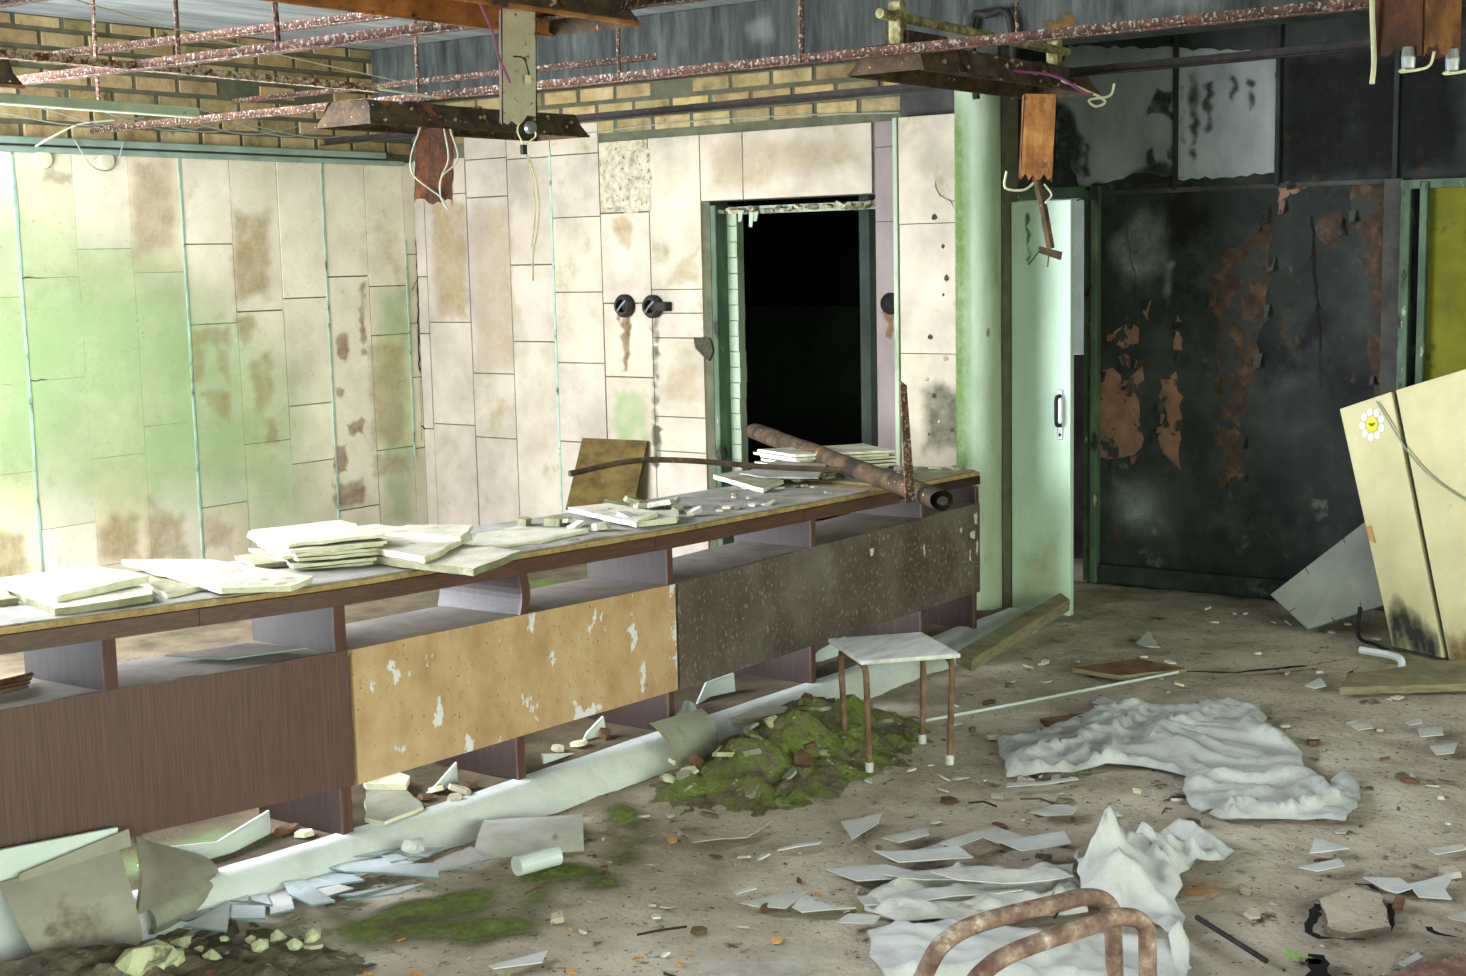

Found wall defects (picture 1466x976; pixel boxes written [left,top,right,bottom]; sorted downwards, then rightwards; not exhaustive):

water stain [1054,104,1172,191]
water stain [1189,77,1254,158]
peeling [1056,45,1310,489]
water stain [337,319,365,359]
water stain [334,448,347,471]
water stain [336,486,364,505]
water stain [652,376,661,467]